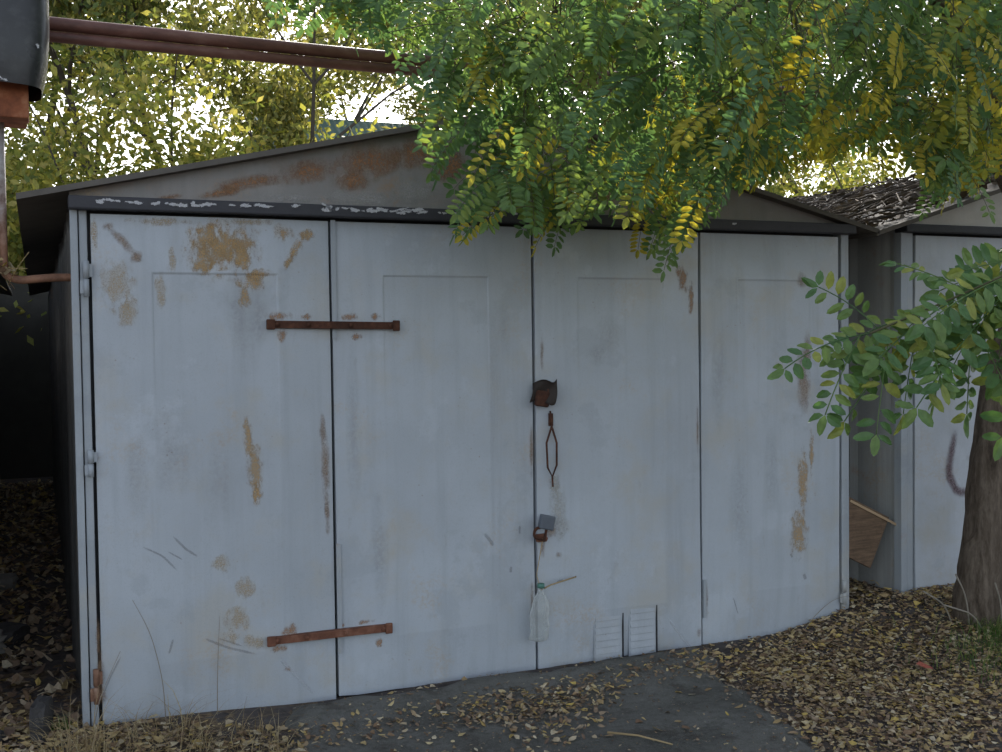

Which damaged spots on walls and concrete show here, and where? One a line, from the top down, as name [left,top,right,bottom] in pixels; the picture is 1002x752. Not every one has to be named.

peeling [96,198,216,207]
peeling [320,202,456,215]
corrosion [189,221,264,304]
corrosion [243,420,261,501]